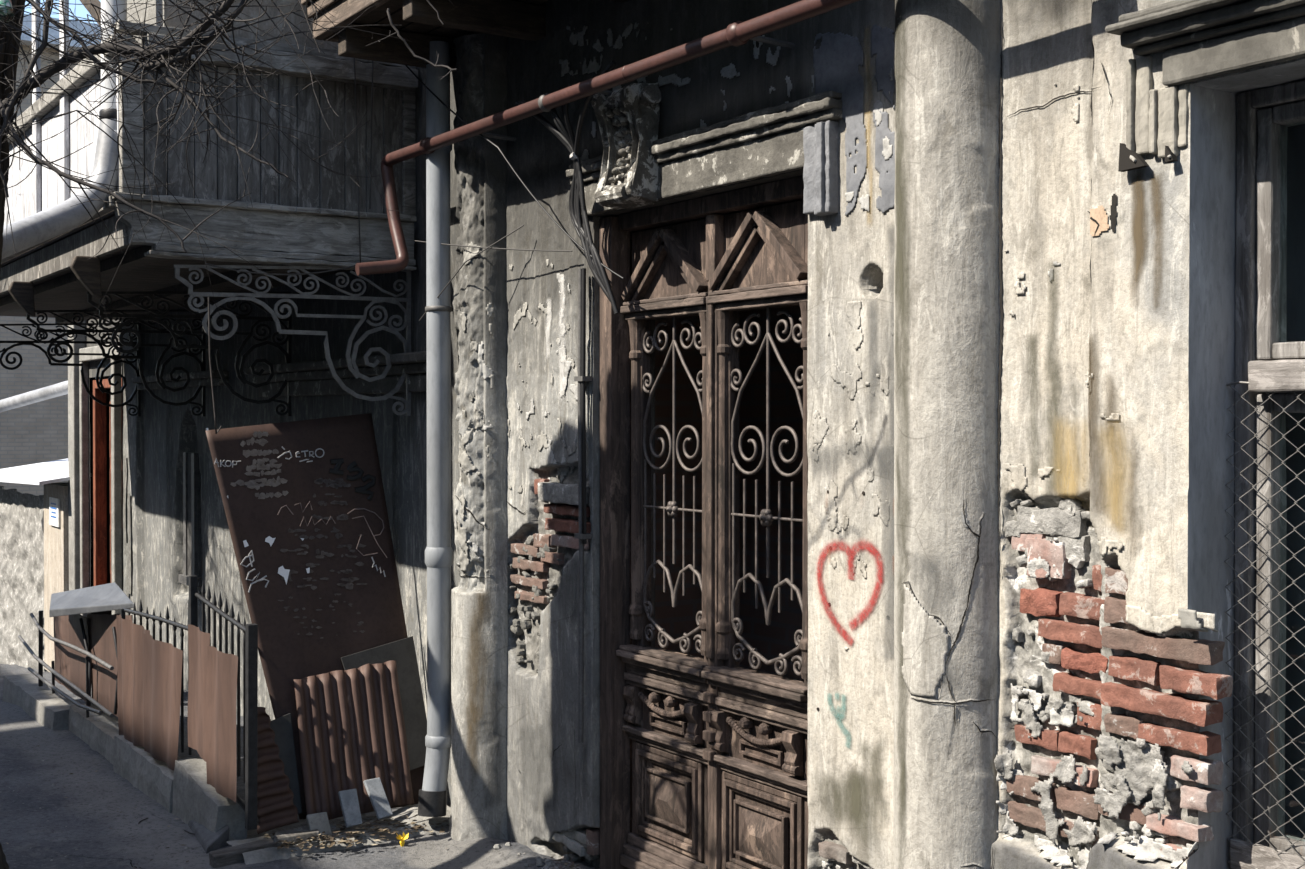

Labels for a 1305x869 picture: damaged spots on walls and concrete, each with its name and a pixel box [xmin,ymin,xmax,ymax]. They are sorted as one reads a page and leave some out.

peeling [559,22,649,77]
peeling [720,63,740,111]
peeling [753,35,792,103]
peeling [811,24,896,216]
flaking render [1071,84,1079,122]
flaking render [463,242,481,266]
flaking render [513,259,578,402]
crack [902,20,1115,738]
spalling [455,303,591,673]
spalling [994,463,1233,869]
spalling [818,841,873,869]